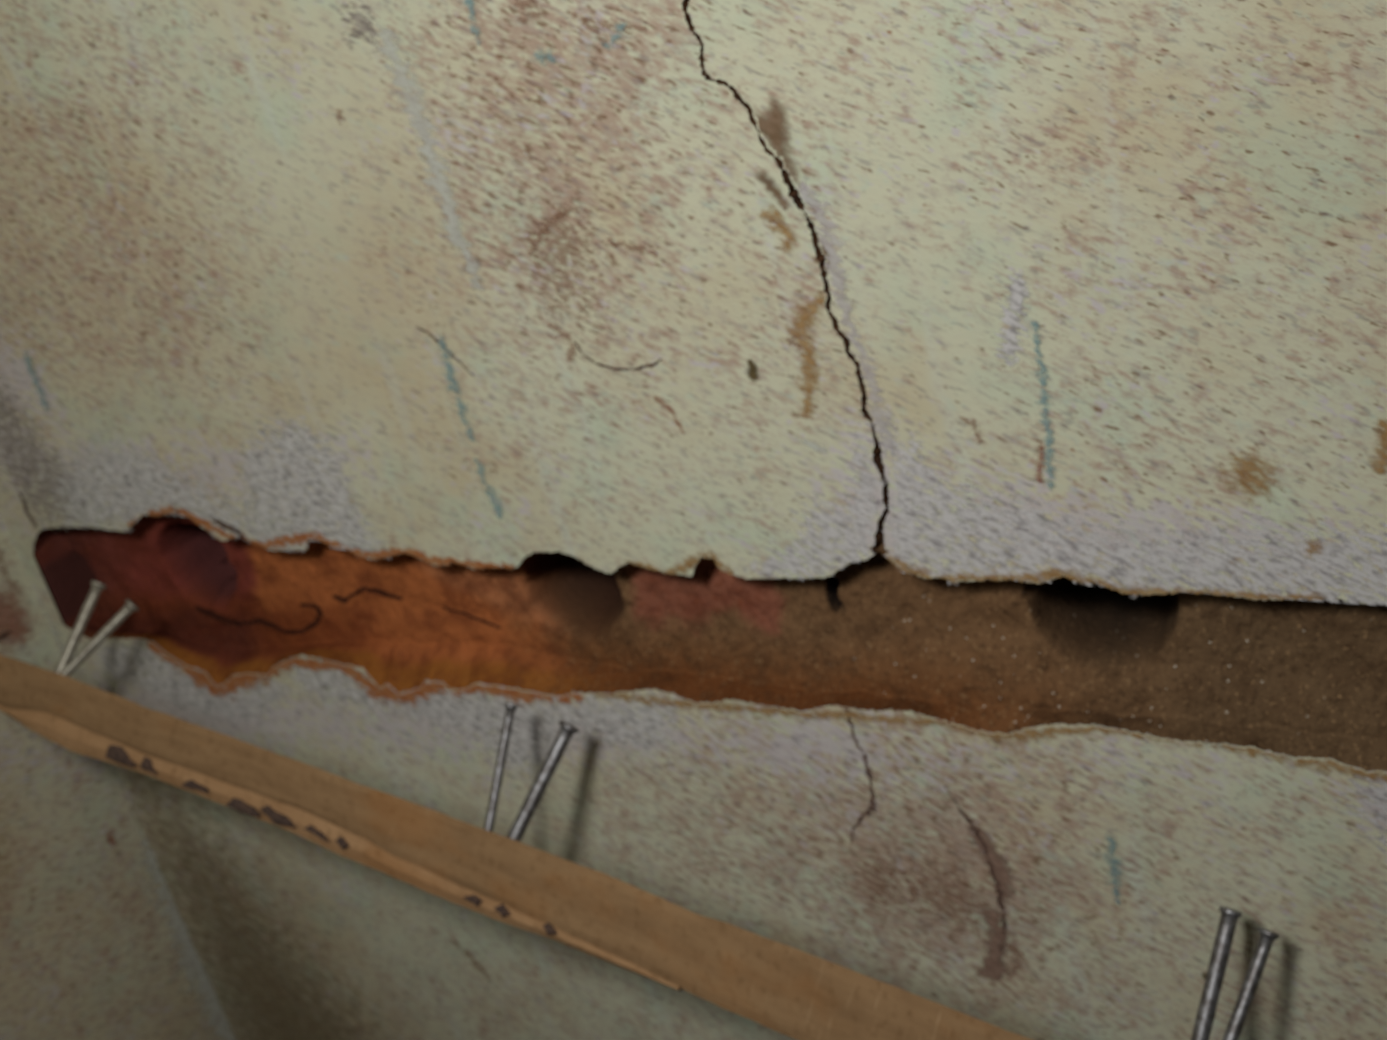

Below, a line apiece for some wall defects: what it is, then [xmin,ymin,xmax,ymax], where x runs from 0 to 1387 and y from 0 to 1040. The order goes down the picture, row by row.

crack [682,0,897,553]
flaking render [33,426,689,787]
crack [844,708,876,842]